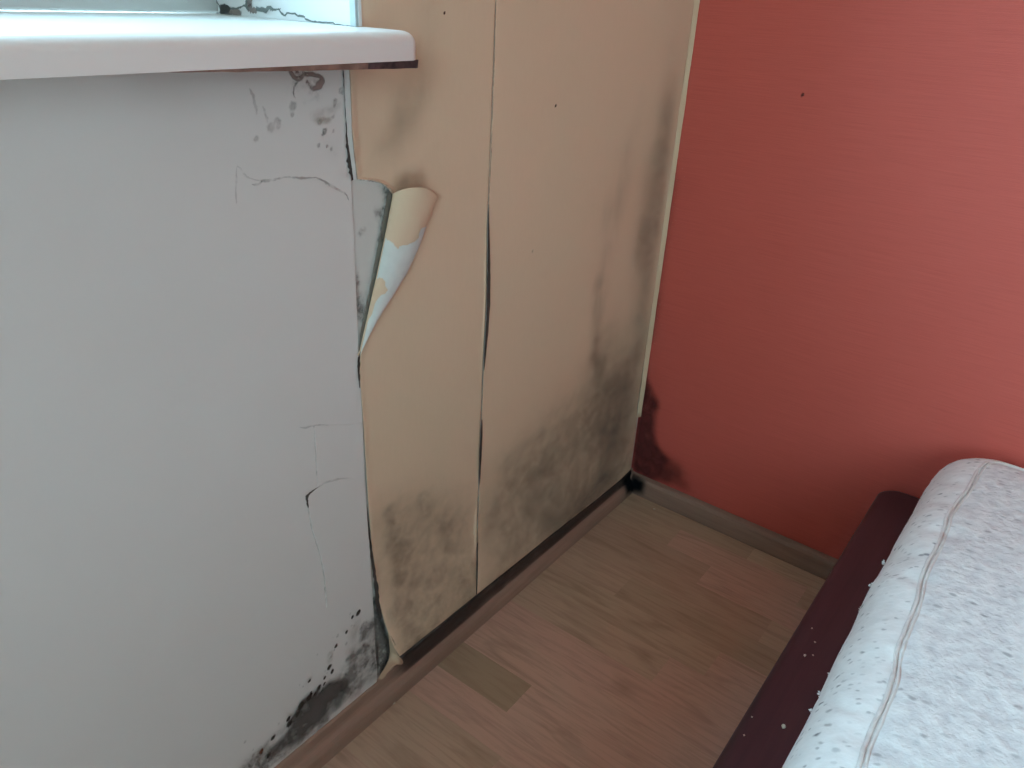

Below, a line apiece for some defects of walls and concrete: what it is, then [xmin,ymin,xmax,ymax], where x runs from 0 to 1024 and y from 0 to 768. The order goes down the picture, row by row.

crack [483,208,491,368]
crack [477,421,485,484]
damp [244,381,679,768]
crack [473,528,481,595]